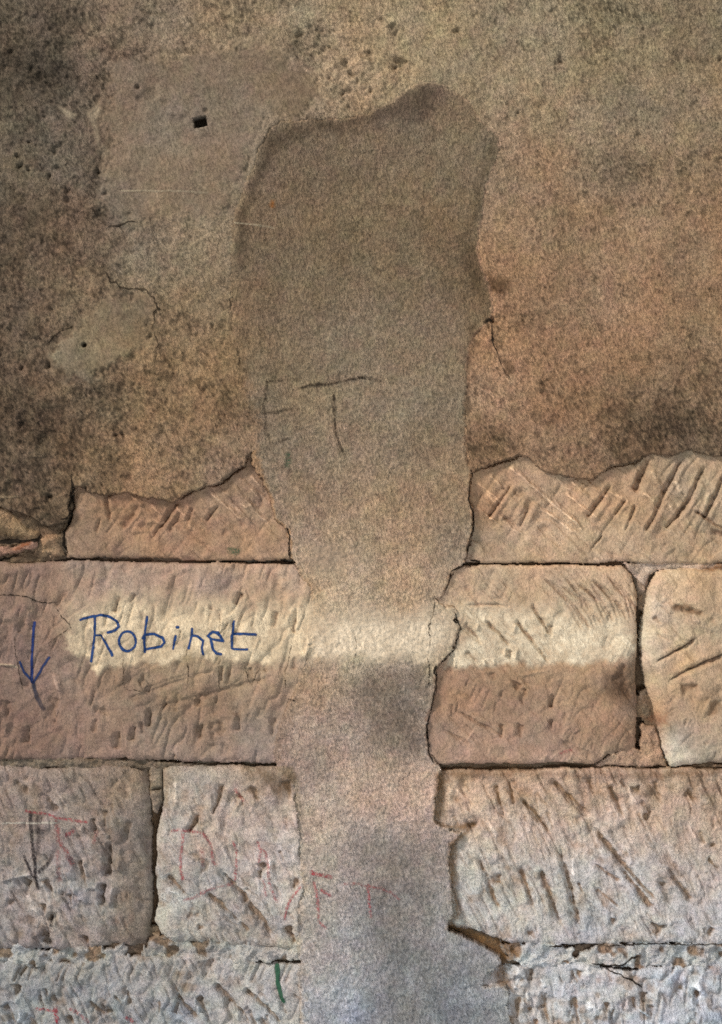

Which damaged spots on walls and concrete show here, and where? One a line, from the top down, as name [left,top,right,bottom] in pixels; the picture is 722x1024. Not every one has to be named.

crack [484,318,507,375]
flaking render [0,449,292,563]
flaking render [466,447,722,565]